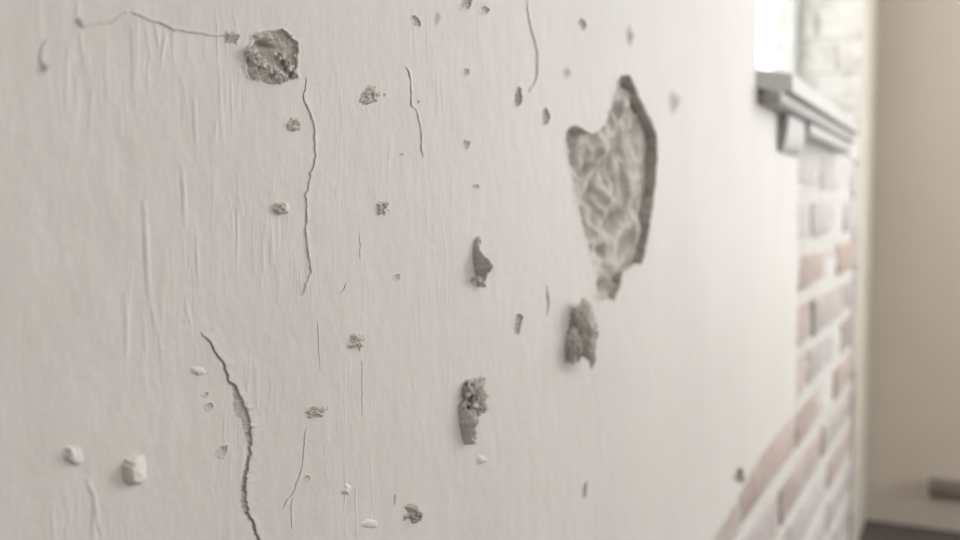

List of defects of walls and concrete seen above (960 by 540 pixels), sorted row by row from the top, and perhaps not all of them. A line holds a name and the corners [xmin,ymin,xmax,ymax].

crack [38,38,47,73]
crack [75,10,224,37]
flaking render [224,25,302,88]
crack [526,0,540,92]
flaking render [359,84,386,105]
crack [405,66,426,158]
crack [298,76,319,296]
flaking render [563,73,659,303]
peeling [473,236,494,288]
crack [200,330,307,540]
peeling [458,375,490,445]
flaking render [391,493,423,524]